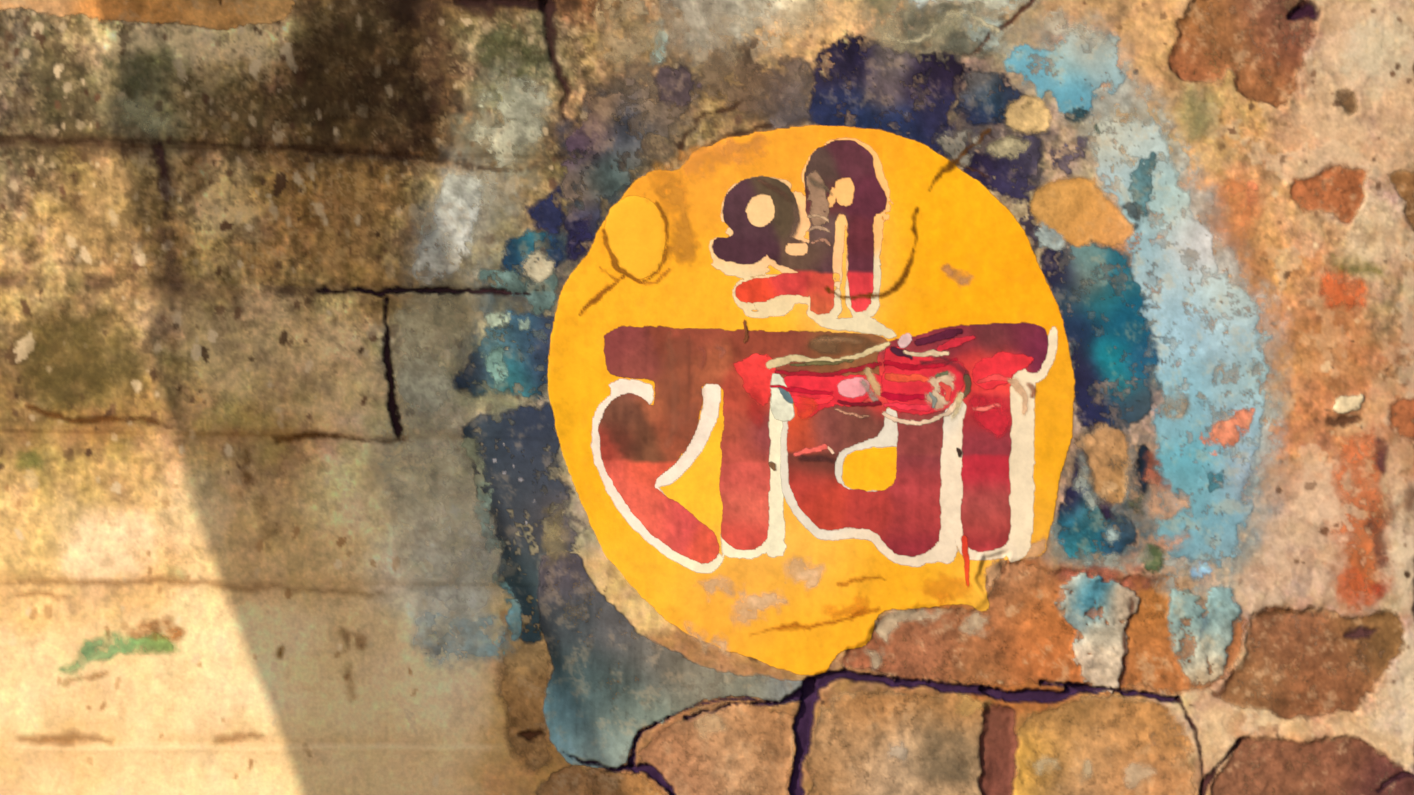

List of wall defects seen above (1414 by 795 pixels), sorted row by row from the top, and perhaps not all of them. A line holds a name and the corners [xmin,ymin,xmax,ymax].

crack [461,0,571,119]
crack [976,0,1034,51]
water stain [152,142,171,218]
crack [27,405,158,424]
crack [275,286,530,442]
peeling [396,0,1414,795]